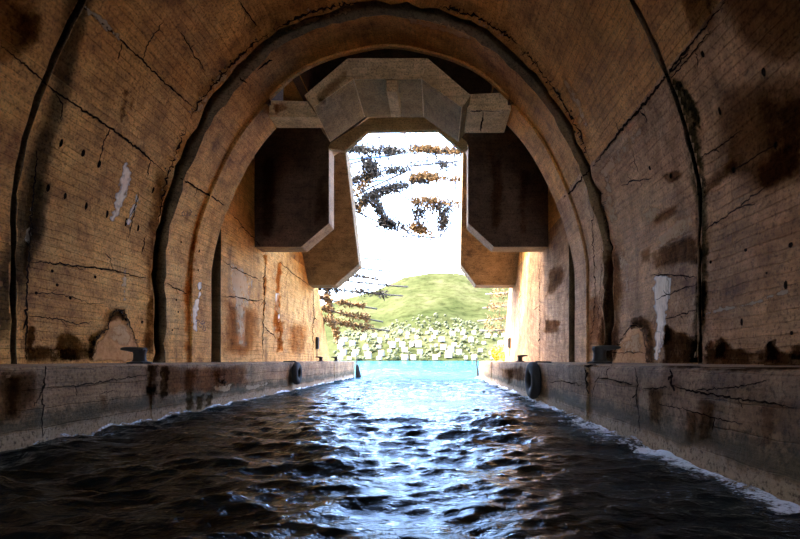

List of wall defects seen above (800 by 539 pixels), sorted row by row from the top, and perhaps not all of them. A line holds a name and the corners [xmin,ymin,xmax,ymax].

crack [1,46,260,254]
crack [82,7,192,106]
crack [564,2,725,197]
leakage [679,85,701,128]
leakage [707,83,800,191]
crack [23,151,145,359]
leakage [26,326,96,362]
spalling [92,309,139,362]
leakage [146,365,170,405]
rust [274,267,283,349]
crack [551,368,794,431]
leakage [642,238,800,372]